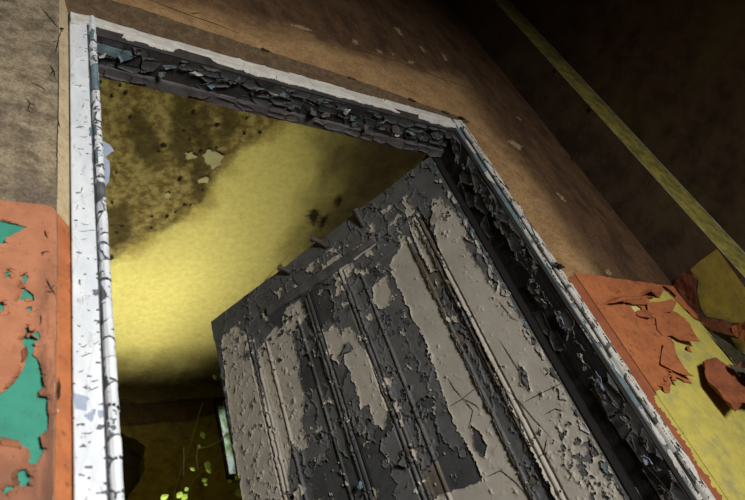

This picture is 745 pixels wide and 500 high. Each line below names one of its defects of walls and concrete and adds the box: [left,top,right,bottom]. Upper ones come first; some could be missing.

peeling [96,43,142,63]
peeling [158,64,215,89]
damp [99,77,282,260]
peeling [185,149,224,169]
peeling [0,219,26,244]
peeling [458,212,494,279]
peeling [506,290,545,360]
peeling [528,264,617,408]
peeling [0,267,57,500]
peeling [604,249,745,500]
peeling [579,418,618,487]
peeling [293,484,306,500]